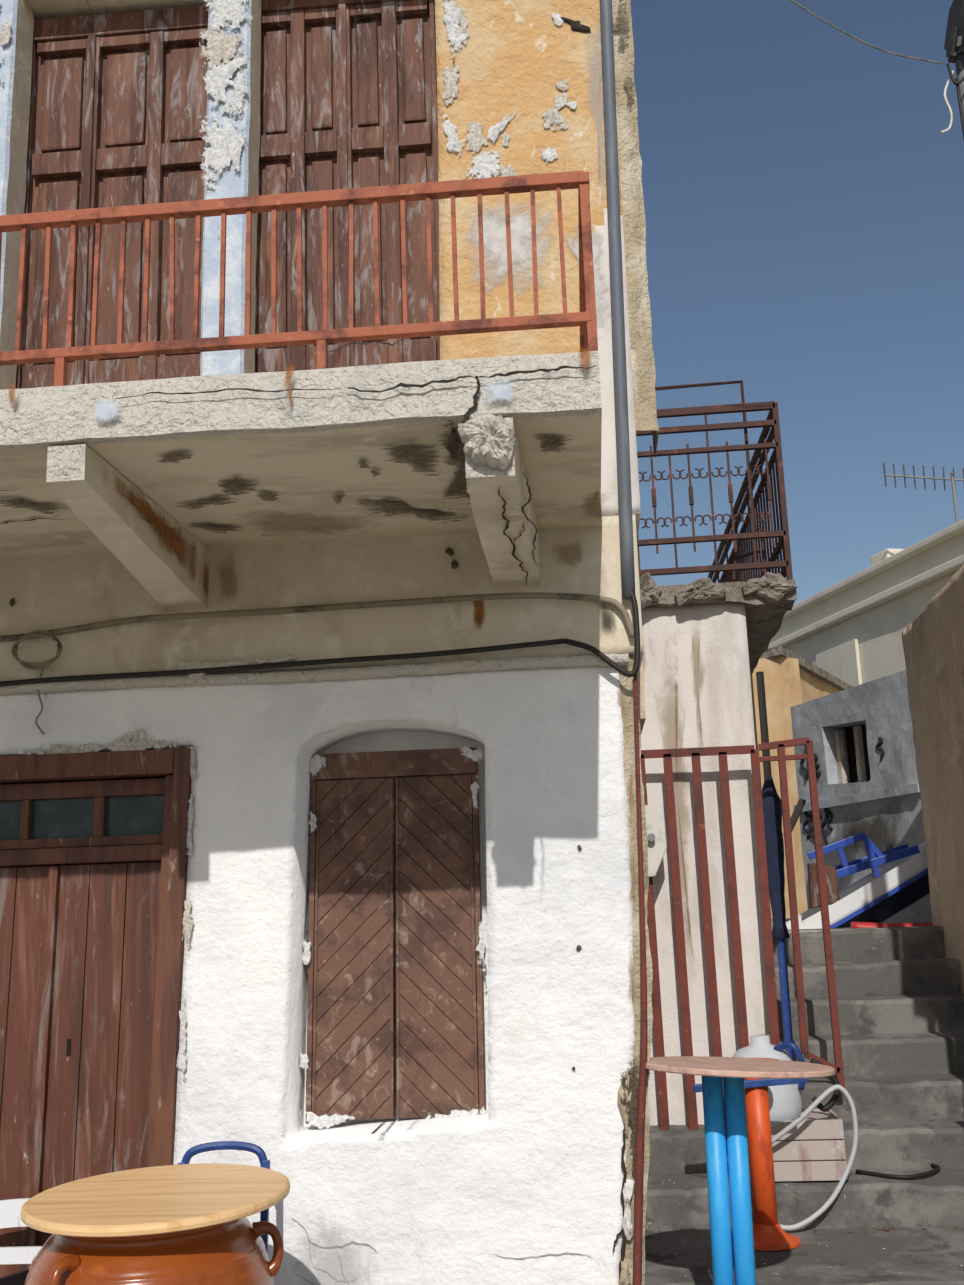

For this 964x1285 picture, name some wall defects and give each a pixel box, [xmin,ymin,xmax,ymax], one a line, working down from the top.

peeling [0,19,12,82]
peeling [198,0,253,189]
peeling [440,0,518,179]
peeling [540,78,577,164]
peeling [552,13,591,33]
crack [115,365,596,424]
crack [316,338,404,353]
rust [580,349,591,369]
rust [121,485,209,597]
crack [498,473,542,585]